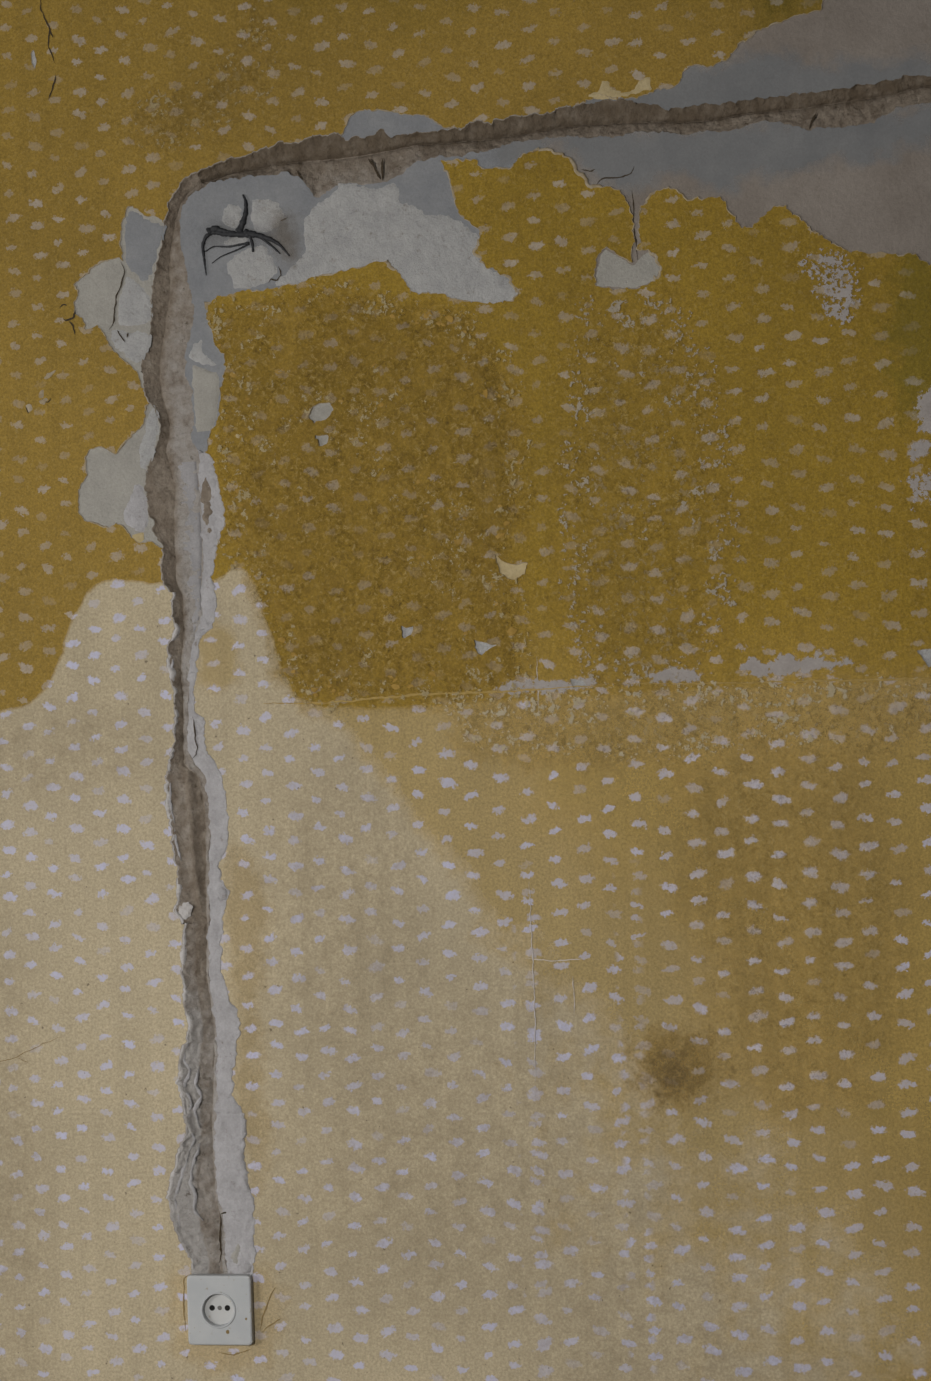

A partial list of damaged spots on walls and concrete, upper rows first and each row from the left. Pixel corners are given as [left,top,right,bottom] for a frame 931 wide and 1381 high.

peeling [127,0,280,152]
peeling [573,0,931,111]
peeling [73,103,931,764]
leakage [206,150,931,1381]